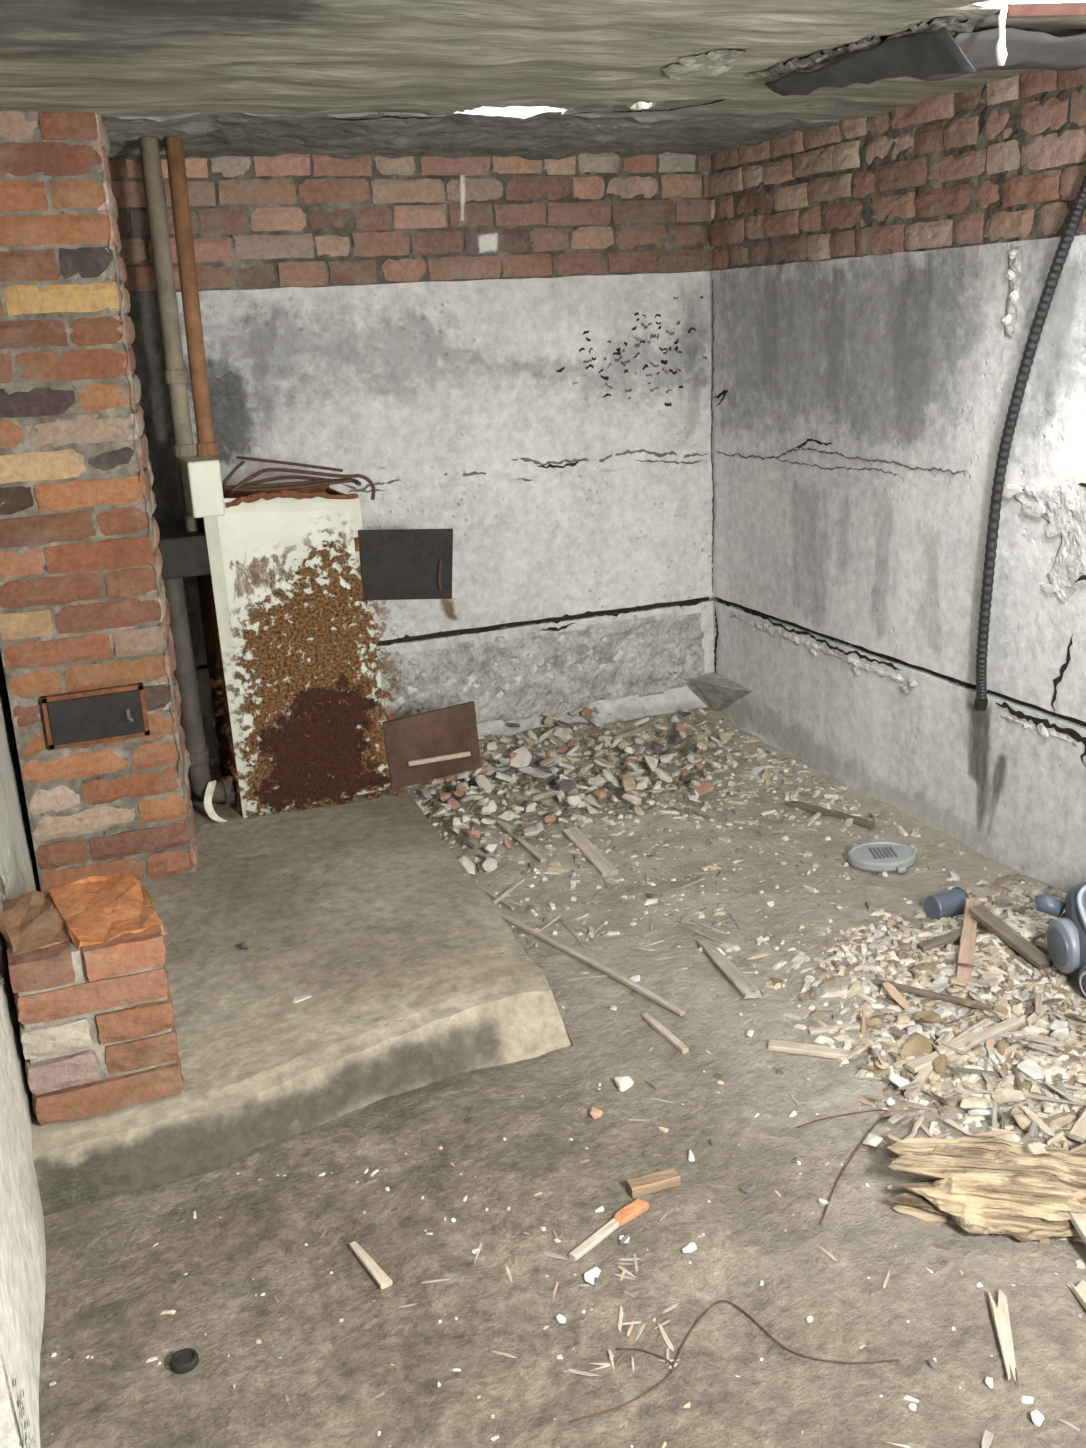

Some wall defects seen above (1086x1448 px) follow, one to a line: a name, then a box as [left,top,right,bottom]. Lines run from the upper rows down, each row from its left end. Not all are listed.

spalling [662,17,985,80]
crack [342,467,402,493]
crack [377,281,1086,767]
spalling [1002,480,1086,604]